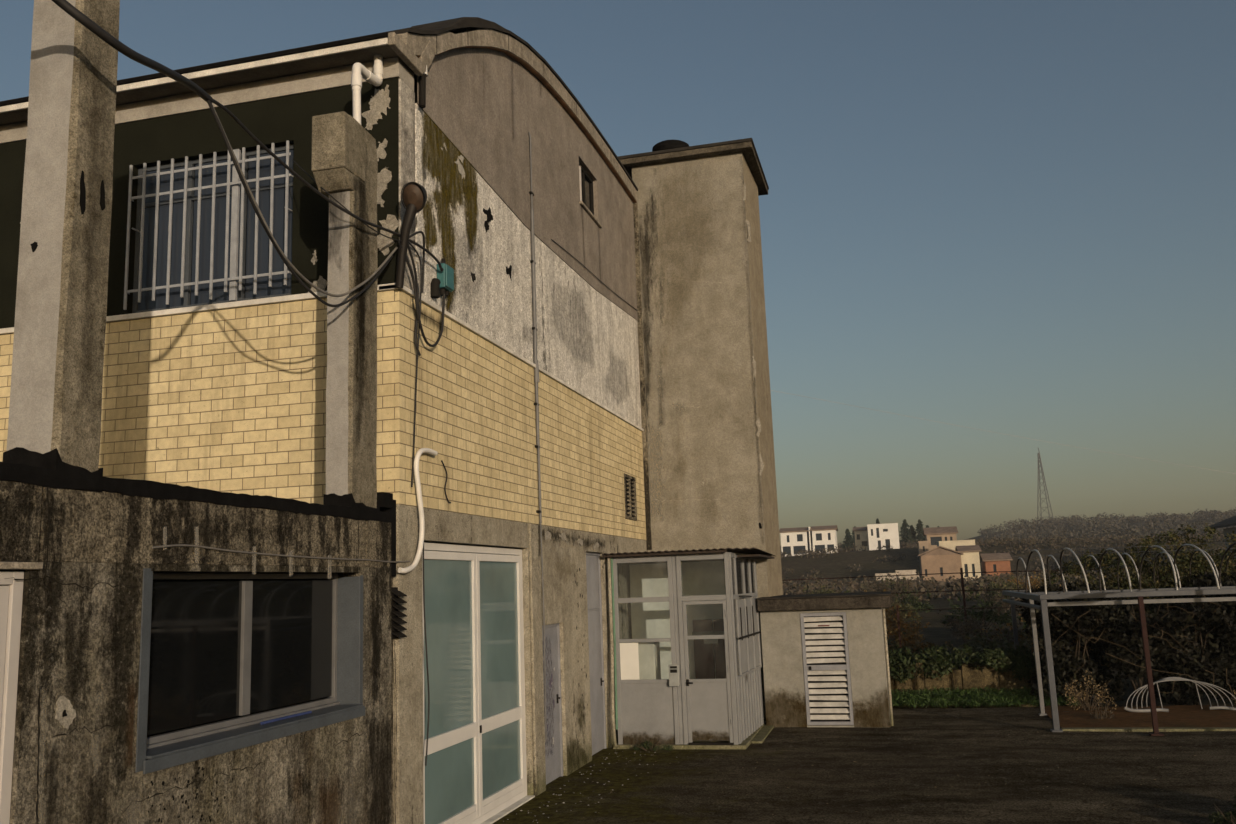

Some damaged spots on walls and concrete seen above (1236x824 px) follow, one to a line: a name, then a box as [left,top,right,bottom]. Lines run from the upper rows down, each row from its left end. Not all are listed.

peeling [308,250,327,299]
peeling [361,85,400,256]
damp [413,183,478,330]
spalling [483,207,493,233]
damp [639,197,664,516]
damp [163,513,286,573]
spalling [55,696,76,730]
damp [365,601,392,824]